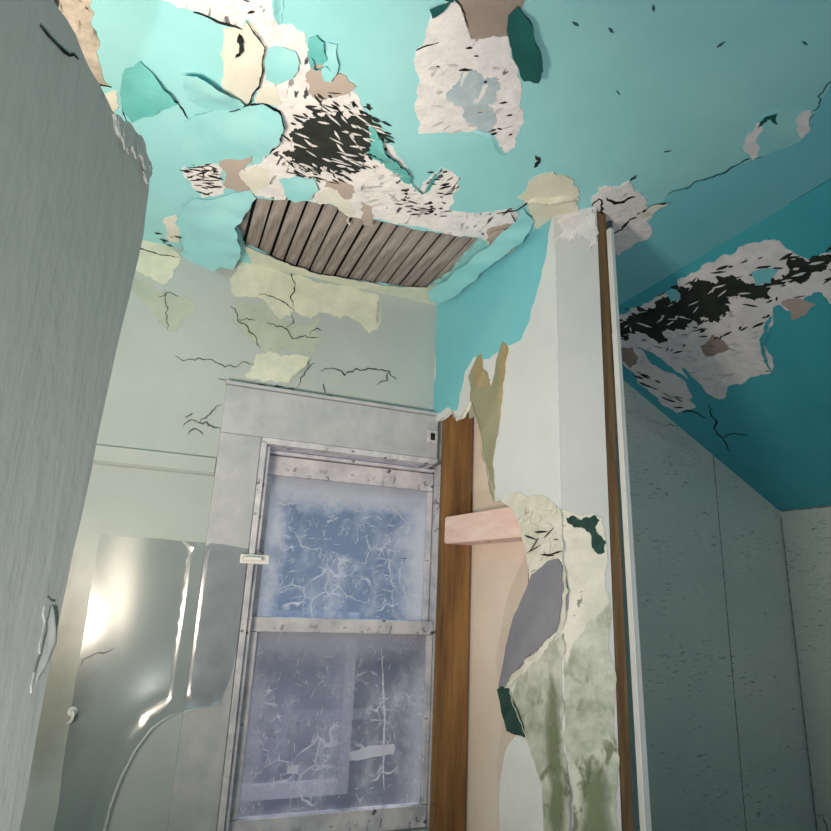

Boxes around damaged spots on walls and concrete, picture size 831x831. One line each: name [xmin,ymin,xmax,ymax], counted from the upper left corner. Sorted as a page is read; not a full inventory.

peeling [743,108,811,160]
peeling [54,0,668,385]
crack [668,156,763,195]
peeling [677,252,800,292]
crack [176,307,321,381]
crack [257,360,396,396]
crack [183,405,220,435]
crack [628,404,748,452]
peeling [440,341,608,831]
peeling [30,598,58,693]
leakage [547,686,563,831]
leakage [584,773,608,831]